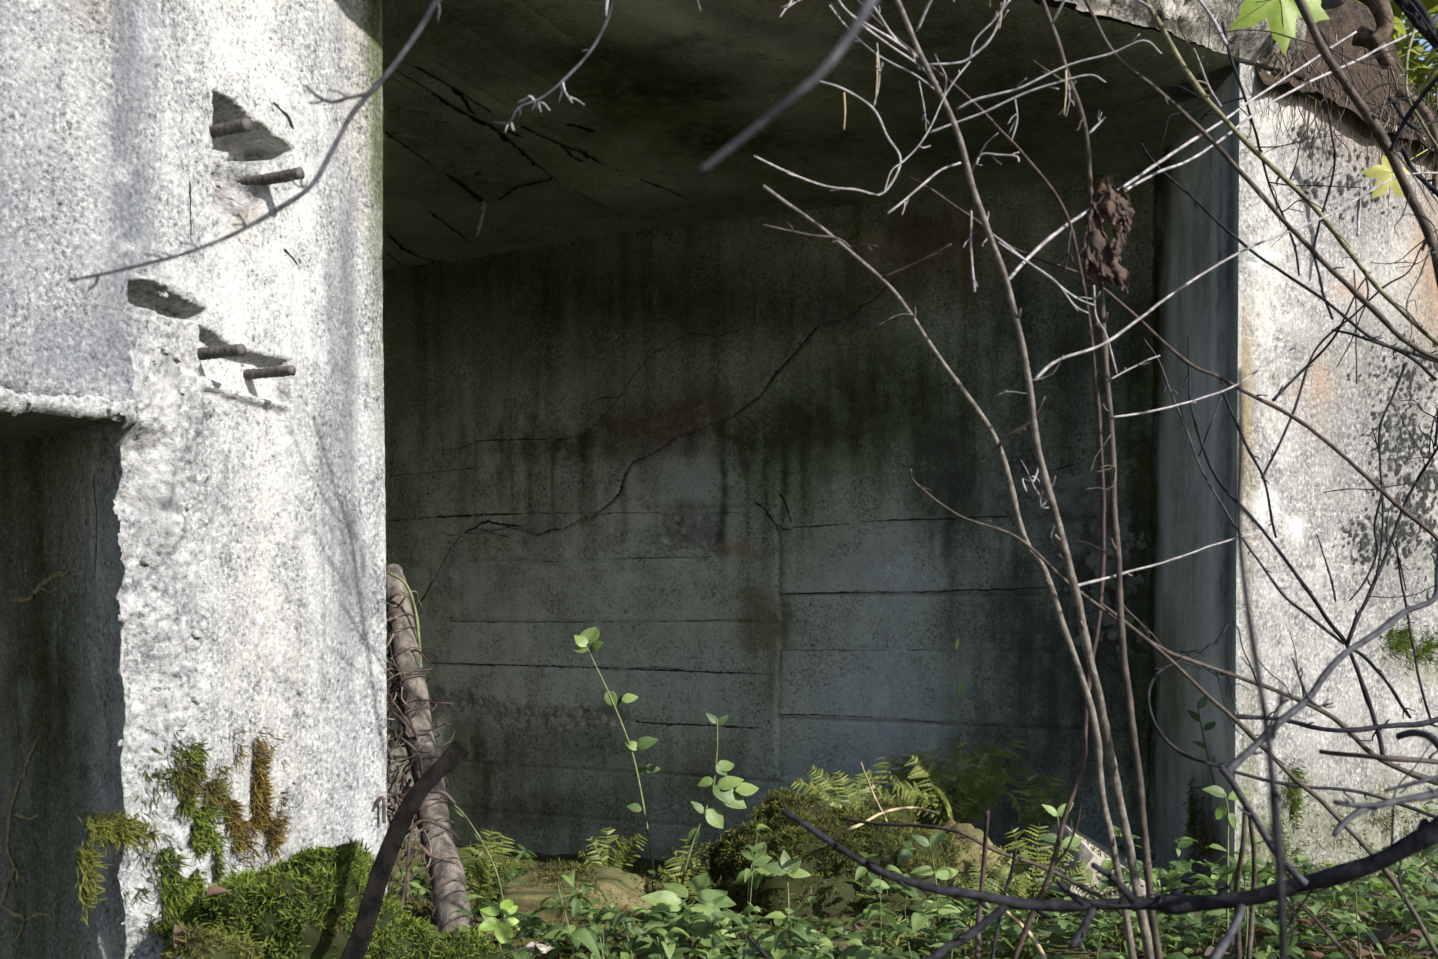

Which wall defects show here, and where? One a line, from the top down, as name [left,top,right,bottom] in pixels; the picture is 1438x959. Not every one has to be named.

spalling [209,118,253,138]
crack [385,64,609,209]
spalling [215,167,305,207]
crack [387,234,435,266]
crack [388,276,898,608]
spalling [0,272,296,959]
crack [452,618,614,626]
crack [660,616,745,624]